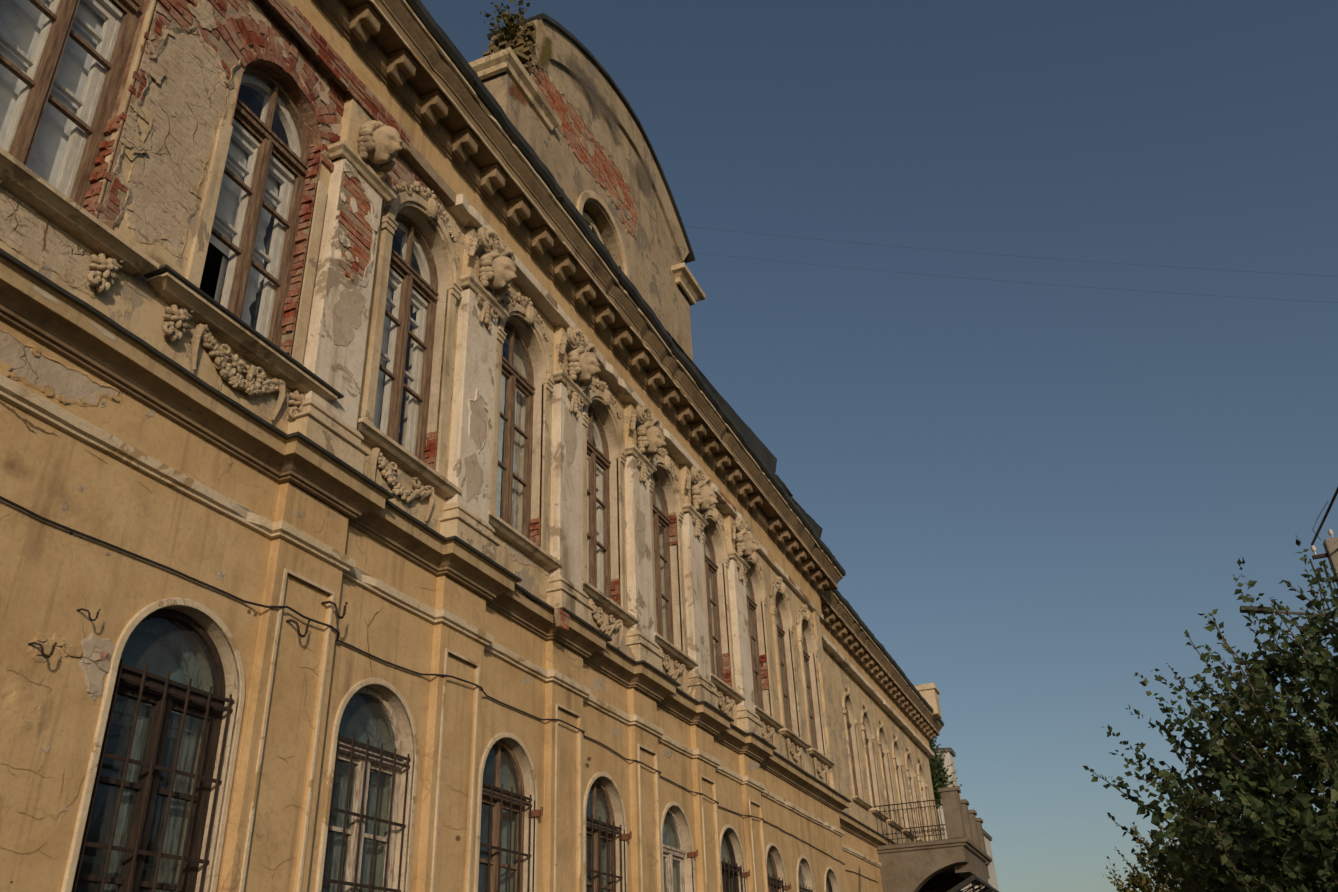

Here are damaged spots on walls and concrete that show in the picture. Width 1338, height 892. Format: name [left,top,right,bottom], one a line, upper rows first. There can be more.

crack [6,213,49,251]
flaking render [0,185,96,298]
flaking render [83,0,447,356]
flaking render [483,22,639,239]
flaking render [0,327,120,407]
peeling [464,388,490,502]
spalling [27,632,116,701]
crack [0,763,65,856]